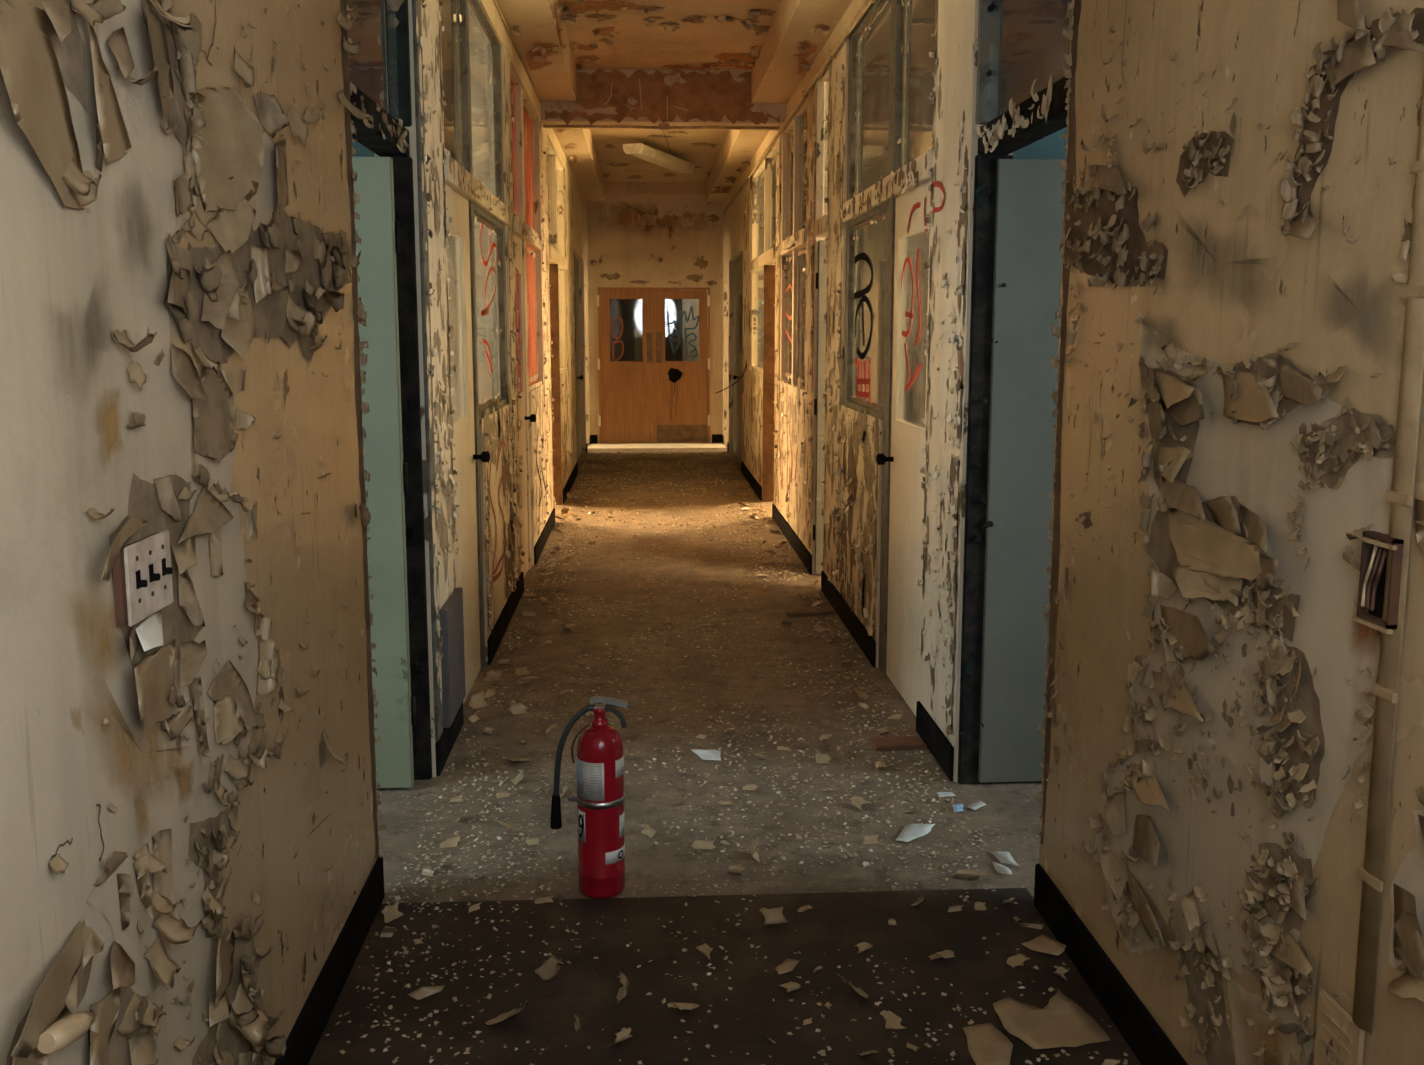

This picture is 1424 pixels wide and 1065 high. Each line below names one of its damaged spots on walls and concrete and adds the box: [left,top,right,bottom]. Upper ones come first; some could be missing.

peeling [0,0,780,1065]
peeling [742,0,1395,1065]
peeling [1278,0,1424,239]
peeling [1387,787,1424,1003]